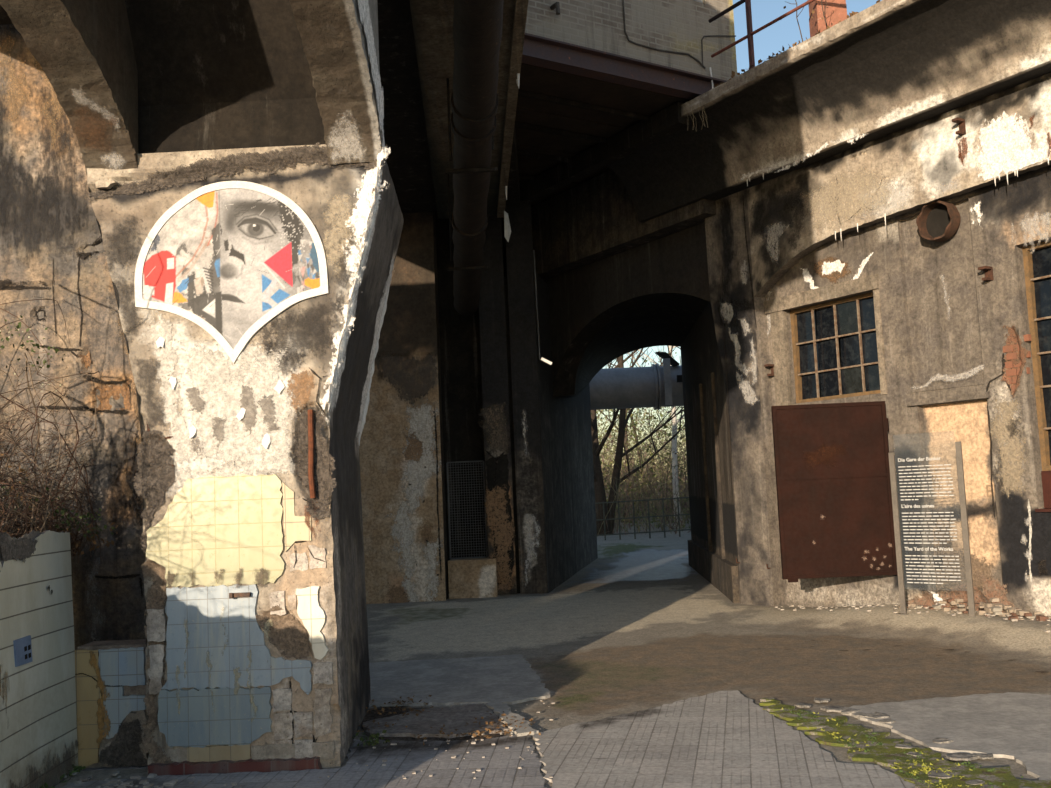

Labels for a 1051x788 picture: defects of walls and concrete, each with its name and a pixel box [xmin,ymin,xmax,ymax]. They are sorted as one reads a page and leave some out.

damp [0,24,87,258]
damp [741,133,868,180]
damp [974,111,1051,181]
flaking render [324,195,354,272]
damp [970,202,983,225]
flaking render [990,325,1032,497]
spalling [0,532,37,563]
peeling [98,309,337,768]
peeling [385,401,443,603]
flaking render [484,484,516,592]